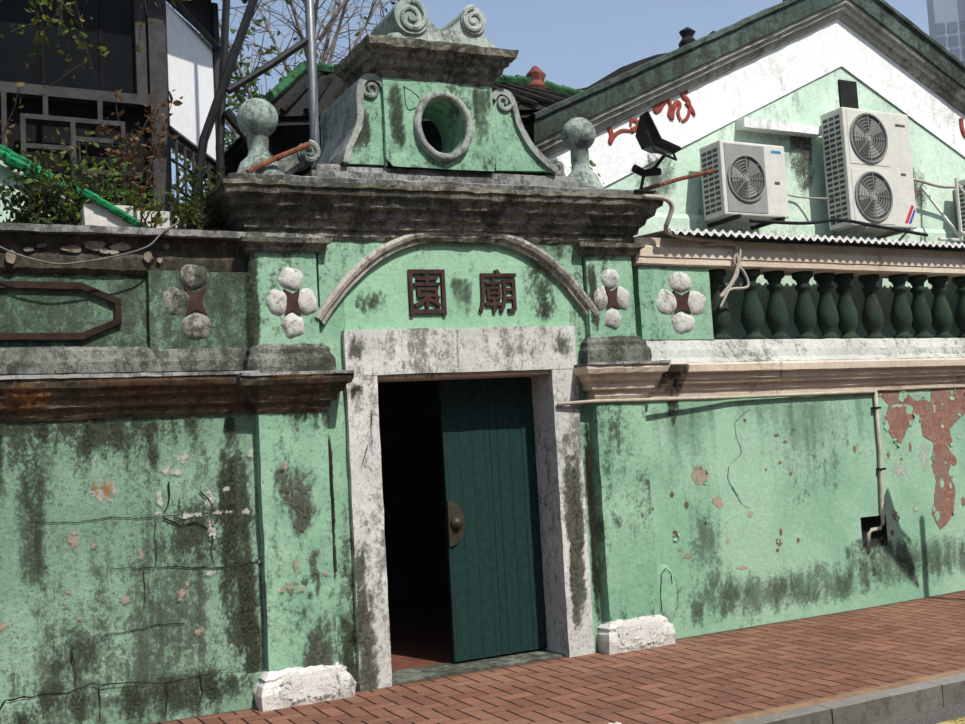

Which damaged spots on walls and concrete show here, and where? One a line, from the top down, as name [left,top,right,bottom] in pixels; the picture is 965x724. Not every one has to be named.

rust [1,384,51,418]
damp [0,415,263,724]
crack [31,482,262,635]
damp [274,409,380,692]
damp [562,422,601,627]
damp [659,364,689,424]
spalling [691,464,709,485]
damp [690,511,965,621]
peeling [879,388,965,529]
crack [0,644,209,722]